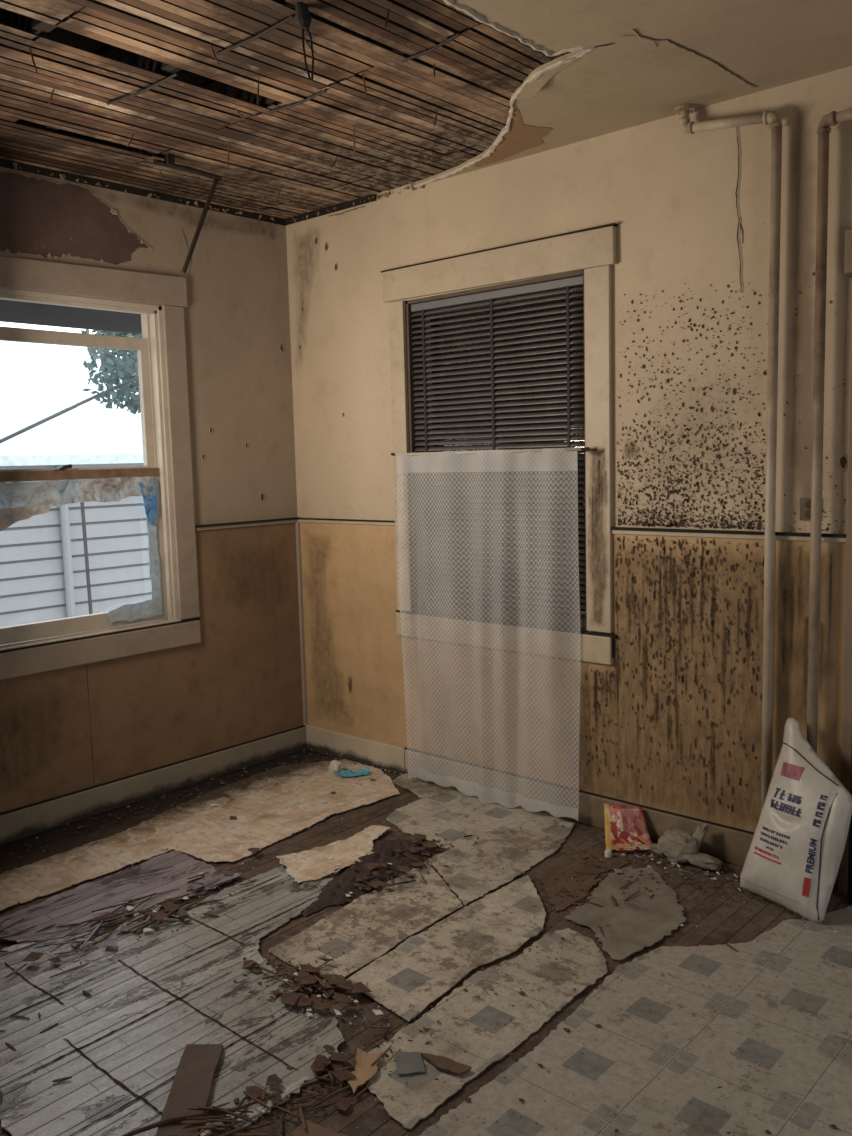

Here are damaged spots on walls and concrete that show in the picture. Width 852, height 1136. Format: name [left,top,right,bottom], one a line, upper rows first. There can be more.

crack [594,29,757,88]
flaking render [0,0,595,265]
crack [735,127,744,293]
damp [575,282,826,814]
peeling [89,872,204,947]
peeling [22,952,61,963]
peeling [233,1074,283,1104]
peeling [310,1045,349,1074]